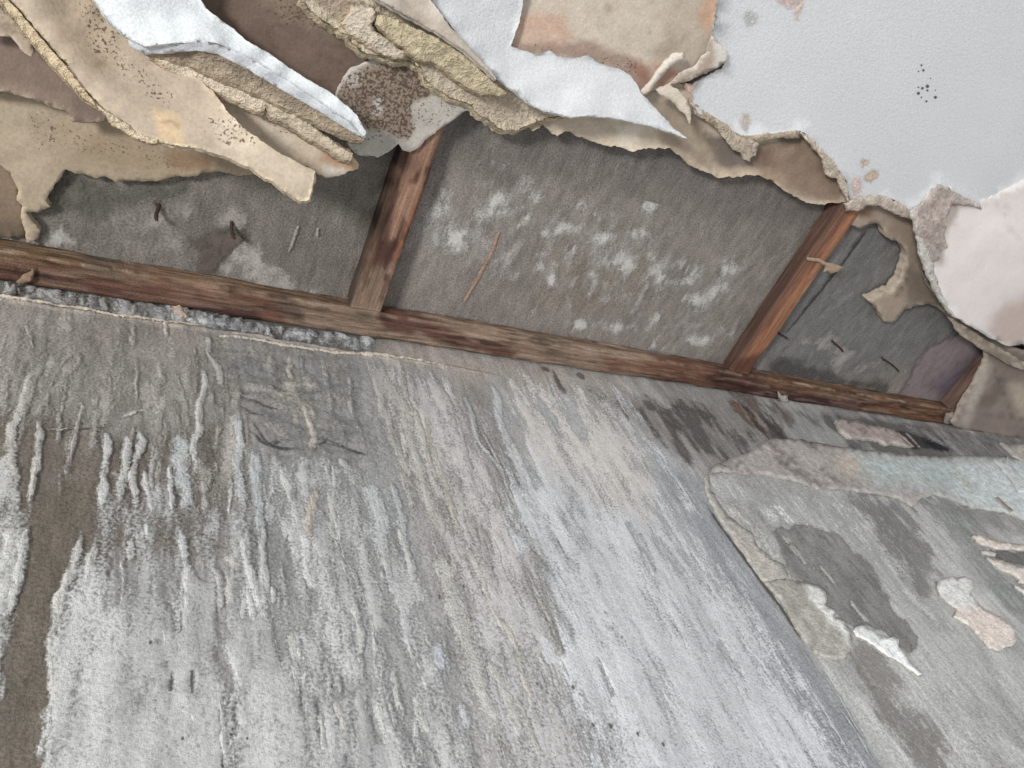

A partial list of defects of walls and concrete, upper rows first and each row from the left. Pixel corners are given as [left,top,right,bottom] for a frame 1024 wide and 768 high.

peeling [511,0,728,125]
leakage [417,182,540,254]
leakage [536,201,741,312]
spalling [843,195,912,220]
leakage [0,271,952,768]
peeling [703,418,1024,677]